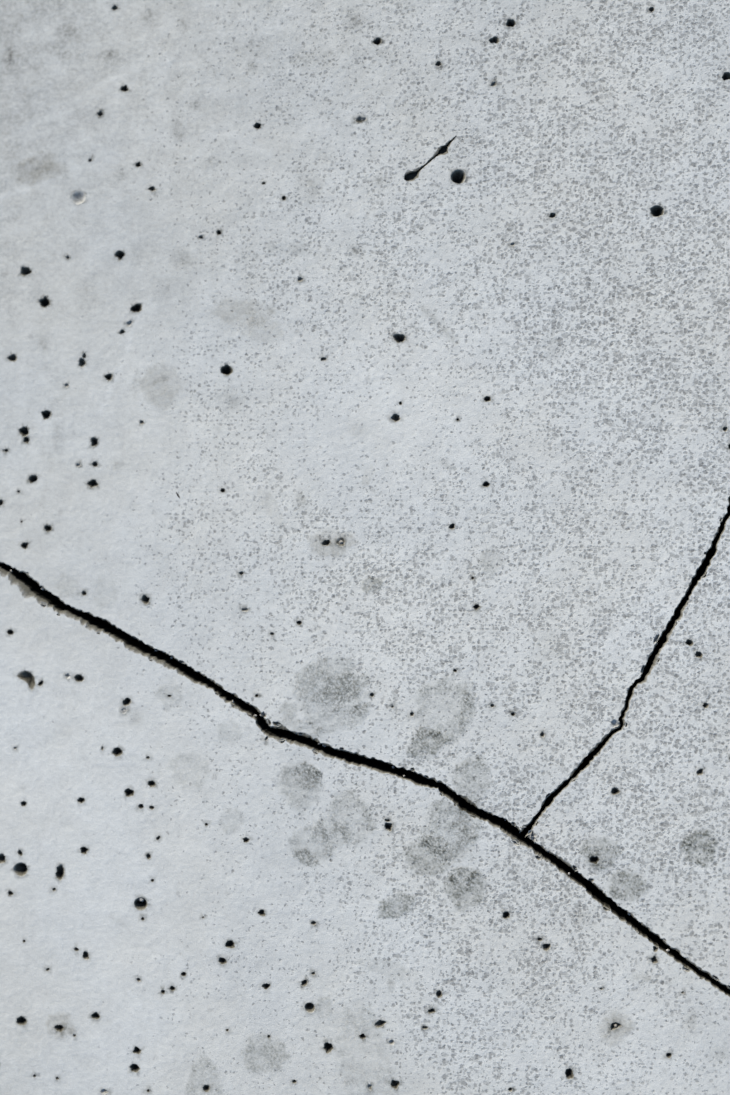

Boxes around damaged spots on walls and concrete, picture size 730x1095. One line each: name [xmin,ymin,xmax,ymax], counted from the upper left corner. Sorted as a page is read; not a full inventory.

crack [0,496,730,997]